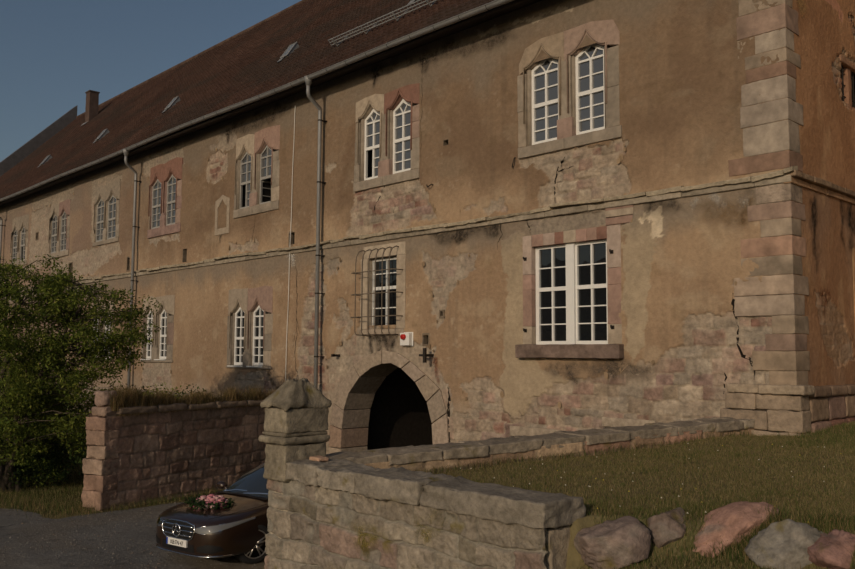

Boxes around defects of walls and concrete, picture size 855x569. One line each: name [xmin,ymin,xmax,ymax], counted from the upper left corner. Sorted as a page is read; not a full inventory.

spalling [207,132,237,184]
spalling [346,179,436,236]
spalling [520,138,663,238]
spalling [295,251,777,454]
crack [731,289,755,376]